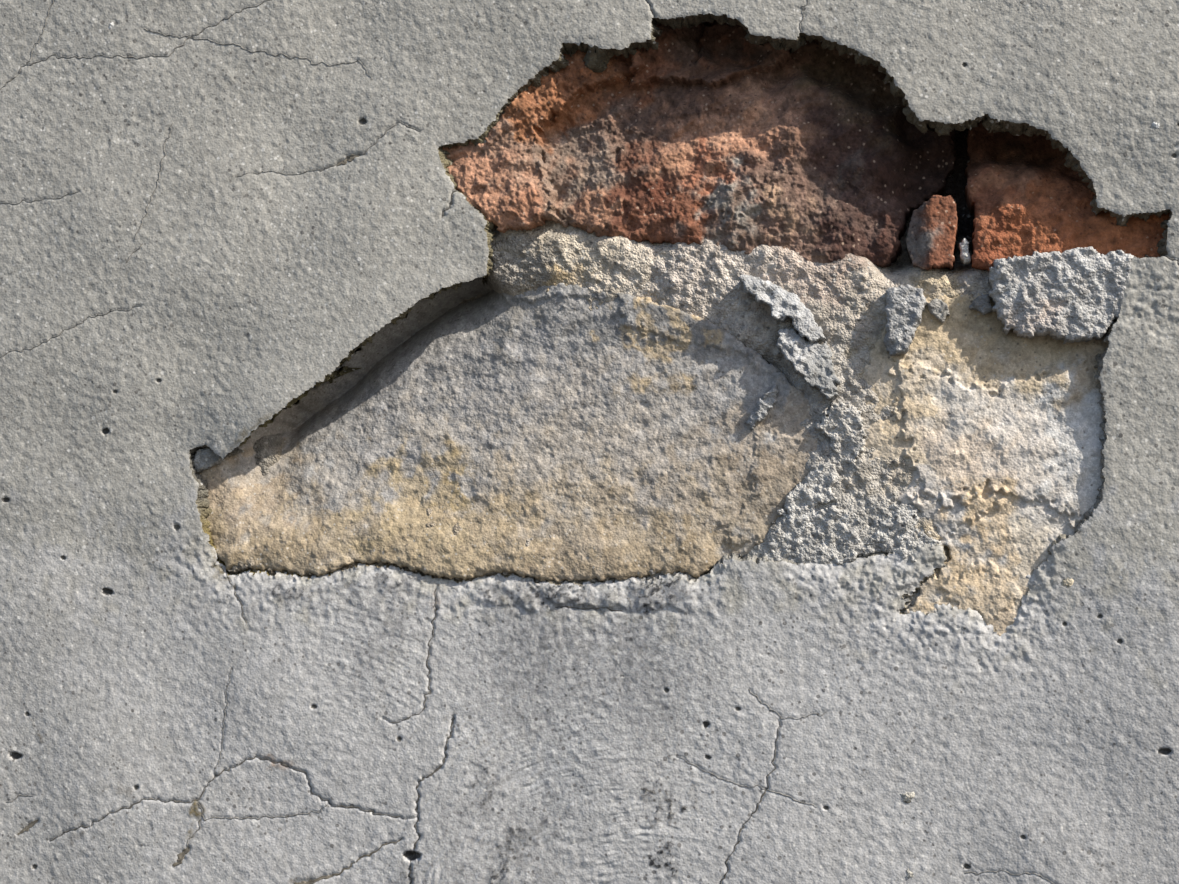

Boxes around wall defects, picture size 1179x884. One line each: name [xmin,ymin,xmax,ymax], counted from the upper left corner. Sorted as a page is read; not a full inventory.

crack [0,0,367,90]
crack [126,122,174,263]
crack [242,121,420,176]
crack [0,306,135,358]
flaking render [189,13,1173,636]
crack [384,588,437,723]
crack [555,604,622,612]
crack [50,671,454,884]
crack [680,689,823,884]